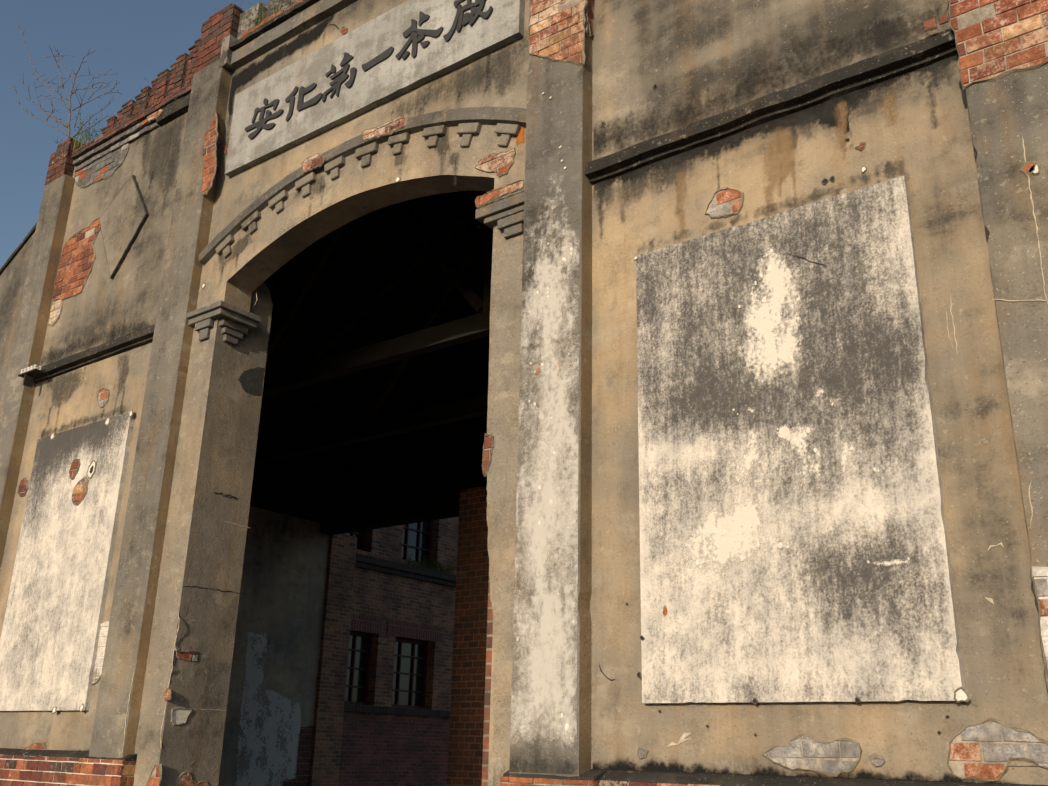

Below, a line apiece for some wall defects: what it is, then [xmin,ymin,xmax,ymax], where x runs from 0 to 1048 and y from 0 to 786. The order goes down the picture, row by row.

flaking render [527,0,594,65]
water stain [593,8,939,153]
flaking render [923,0,1048,90]
flaking render [201,110,228,195]
flaking render [362,117,408,142]
flaking render [475,147,525,209]
flaking render [705,187,744,219]
water stain [594,54,959,236]
crack [991,137,1048,303]
flaking render [48,217,101,327]
flaking render [762,733,886,777]
flaking render [937,718,1048,782]